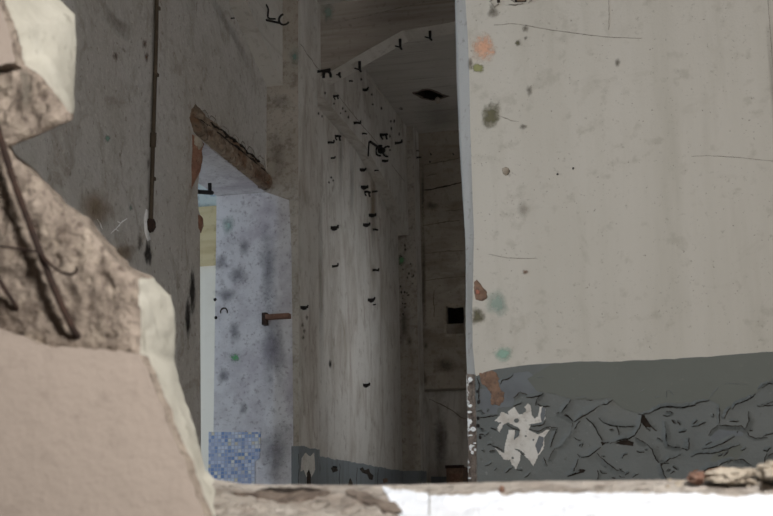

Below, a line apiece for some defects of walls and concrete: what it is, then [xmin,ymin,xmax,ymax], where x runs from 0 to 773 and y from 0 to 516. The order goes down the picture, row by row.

damp [483,105,525,128]
spalling [191,135,204,189]
spalling [0,65,141,354]
corrosion [479,371,504,406]
peeling [466,372,773,483]
peeling [345,478,773,516]